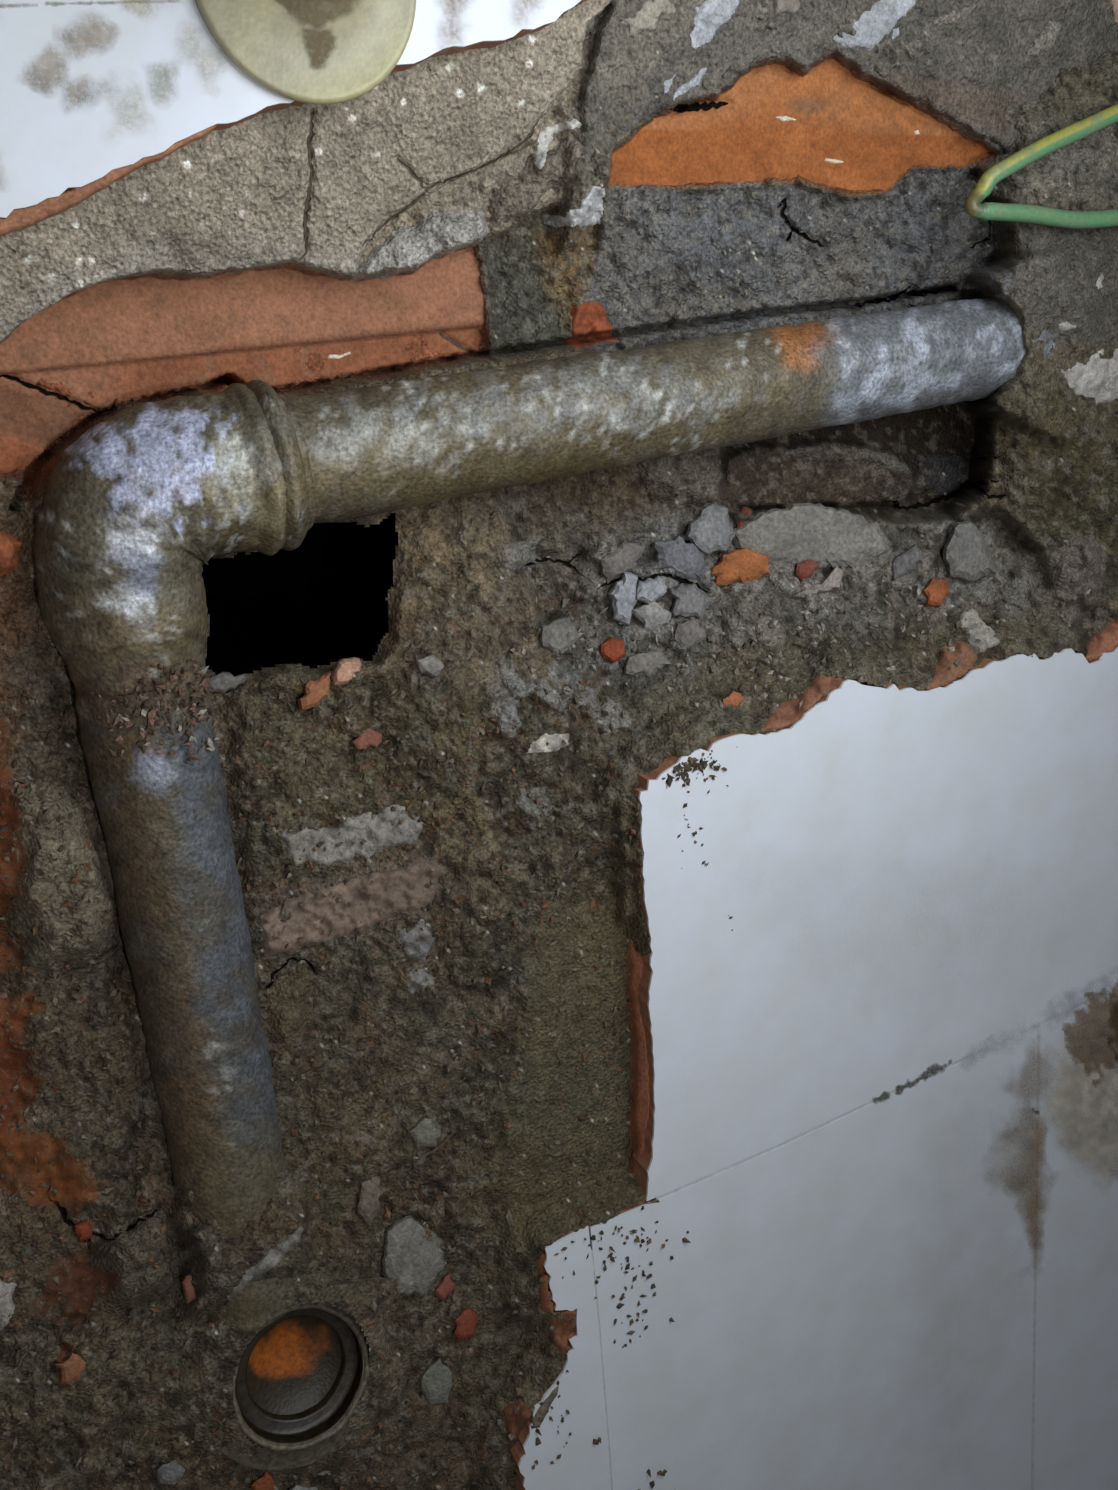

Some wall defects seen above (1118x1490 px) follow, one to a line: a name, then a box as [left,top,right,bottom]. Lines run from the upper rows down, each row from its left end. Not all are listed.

crack [300,108,315,261]
crack [362,117,541,247]
spalling [0,0,1118,505]
crack [0,374,97,413]
spalling [761,675,836,731]
spalling [927,640,977,689]
spalling [1086,617,1118,662]
flaking render [260,857,441,959]
damp [1050,983,1118,1176]
spalling [535,1253,576,1356]
rust [247,1316,342,1415]
spalling [503,1385,559,1443]